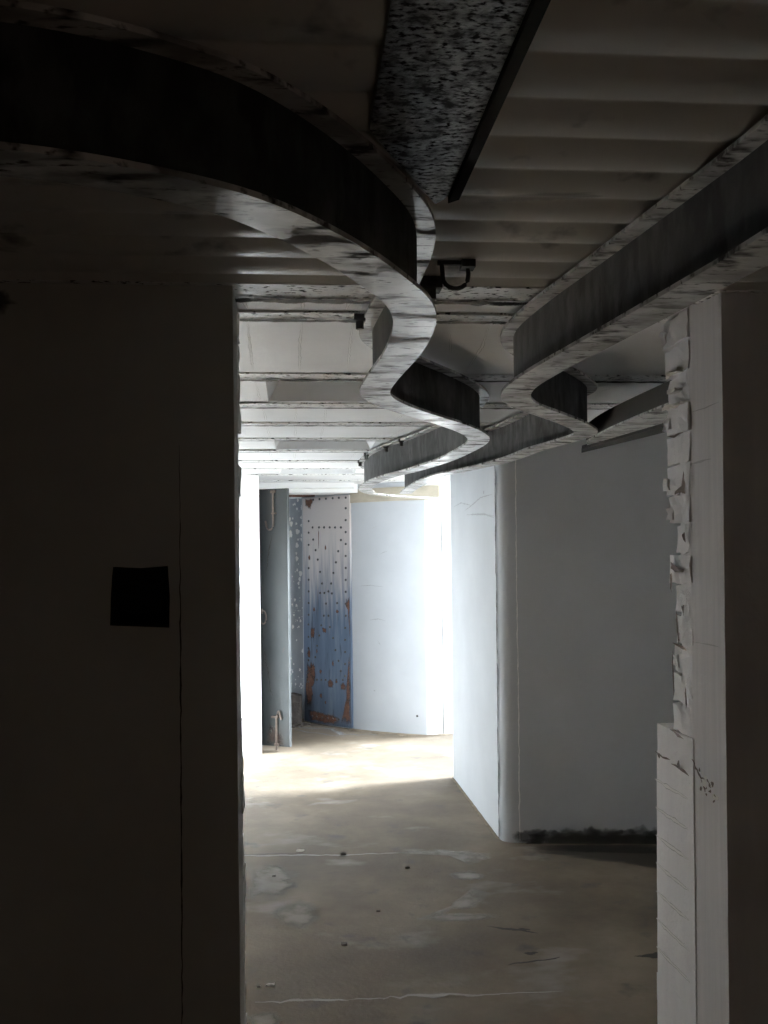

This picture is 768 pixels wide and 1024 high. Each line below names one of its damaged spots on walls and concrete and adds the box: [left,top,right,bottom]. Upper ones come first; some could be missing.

rust [306,628,350,724]
spalling [672,605,687,707]
crack [655,729,689,776]